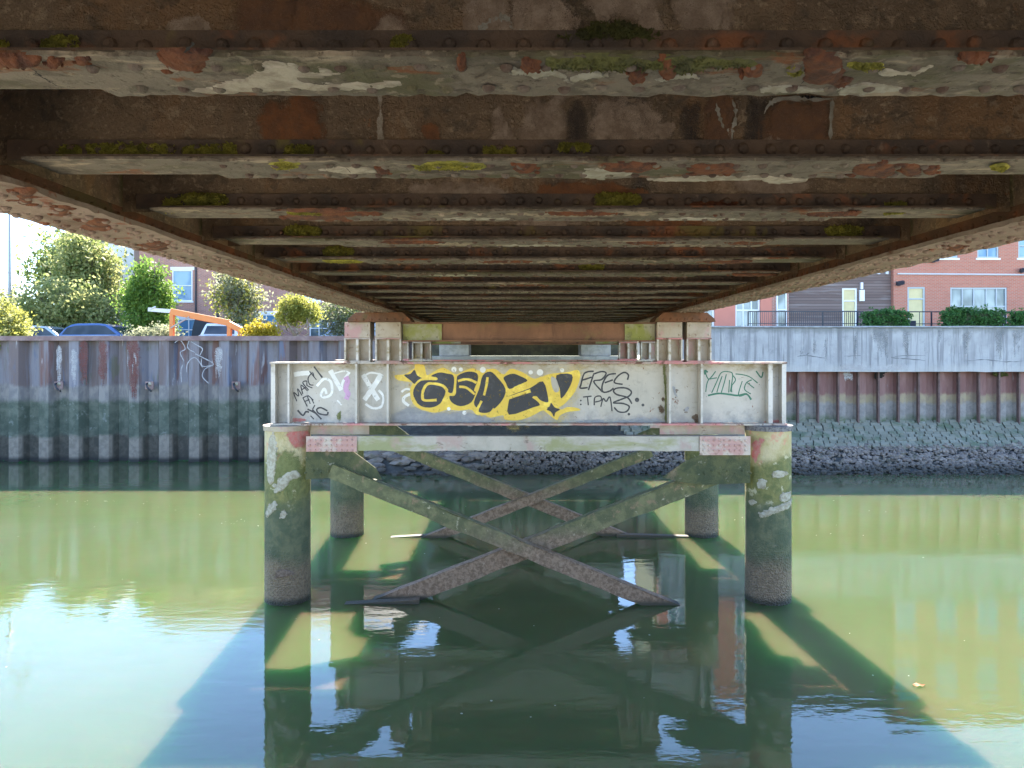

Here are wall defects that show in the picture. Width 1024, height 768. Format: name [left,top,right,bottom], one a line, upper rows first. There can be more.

corrosion [0,52,92,70]
corrosion [156,48,213,74]
peeling [191,60,402,94]
peeling [509,67,609,85]
peeling [760,85,824,94]
corrosion [802,47,854,89]
peeling [837,65,934,96]
corrosion [845,160,941,179]
corrosion [5,187,111,231]
corrosion [126,341,141,399]
peeling [265,432,301,519]
peeling [748,470,792,518]